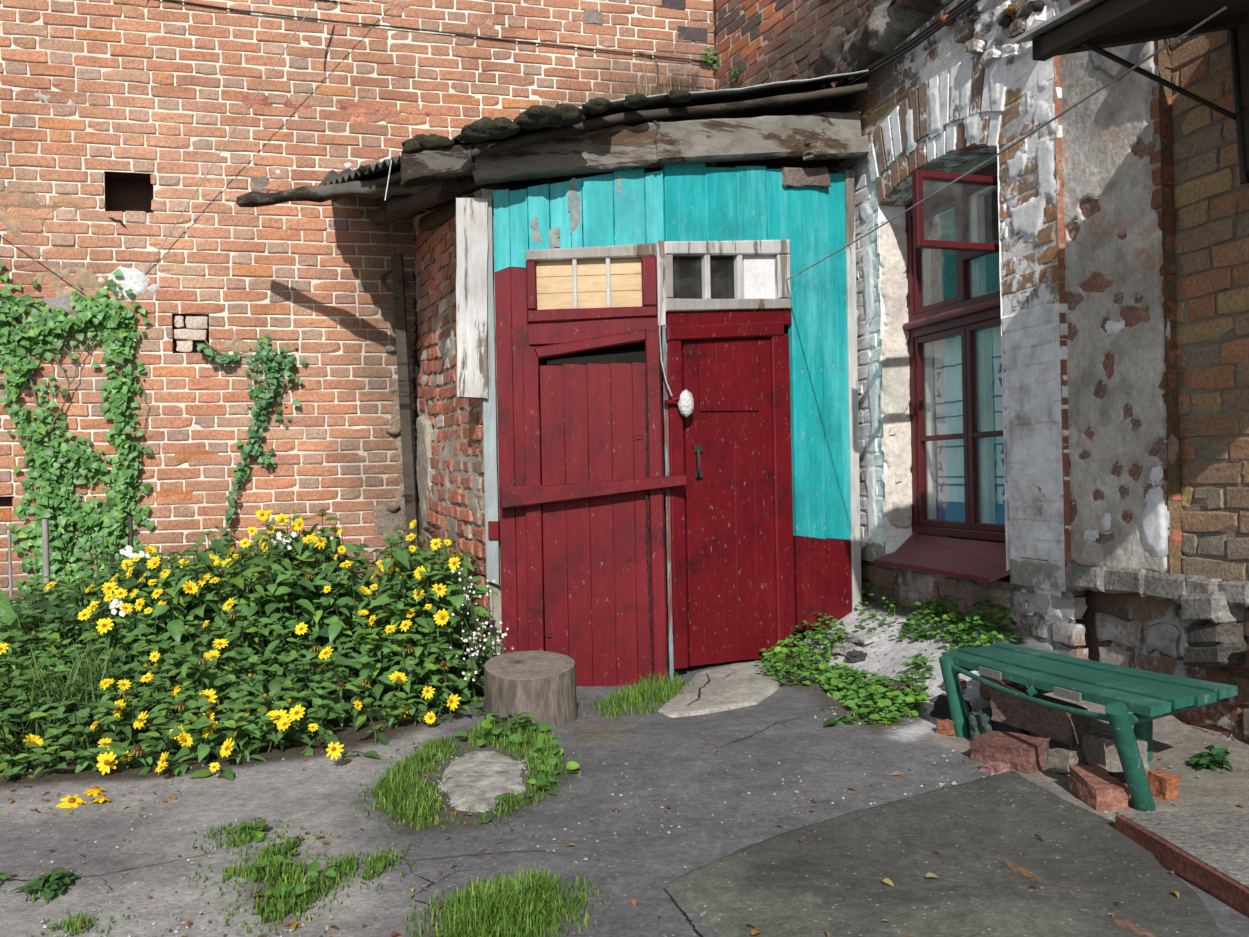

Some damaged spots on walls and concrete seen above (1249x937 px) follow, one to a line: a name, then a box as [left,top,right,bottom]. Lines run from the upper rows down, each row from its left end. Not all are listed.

peeling [905,83,943,156]
peeling [958,44,1001,146]
peeling [1006,67,1060,243]
flaking render [1131,137,1156,159]
flaking render [1067,198,1101,241]
flaking render [1067,272,1150,341]
flaking render [1093,351,1115,399]
flaking render [1079,427,1095,460]
flaking render [1123,403,1141,432]
peeling [1084,433,1179,558]